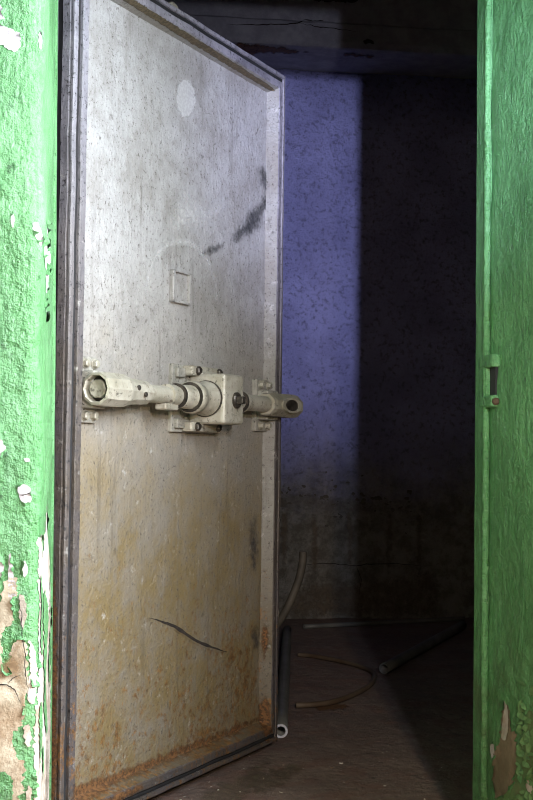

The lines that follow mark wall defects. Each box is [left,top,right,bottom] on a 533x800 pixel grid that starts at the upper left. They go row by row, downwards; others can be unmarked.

peeling [0,5,23,52]
peeling [32,220,52,323]
peeling [16,483,33,507]
crack [0,598,29,703]
peeling [0,506,53,800]
peeling [490,695,517,799]